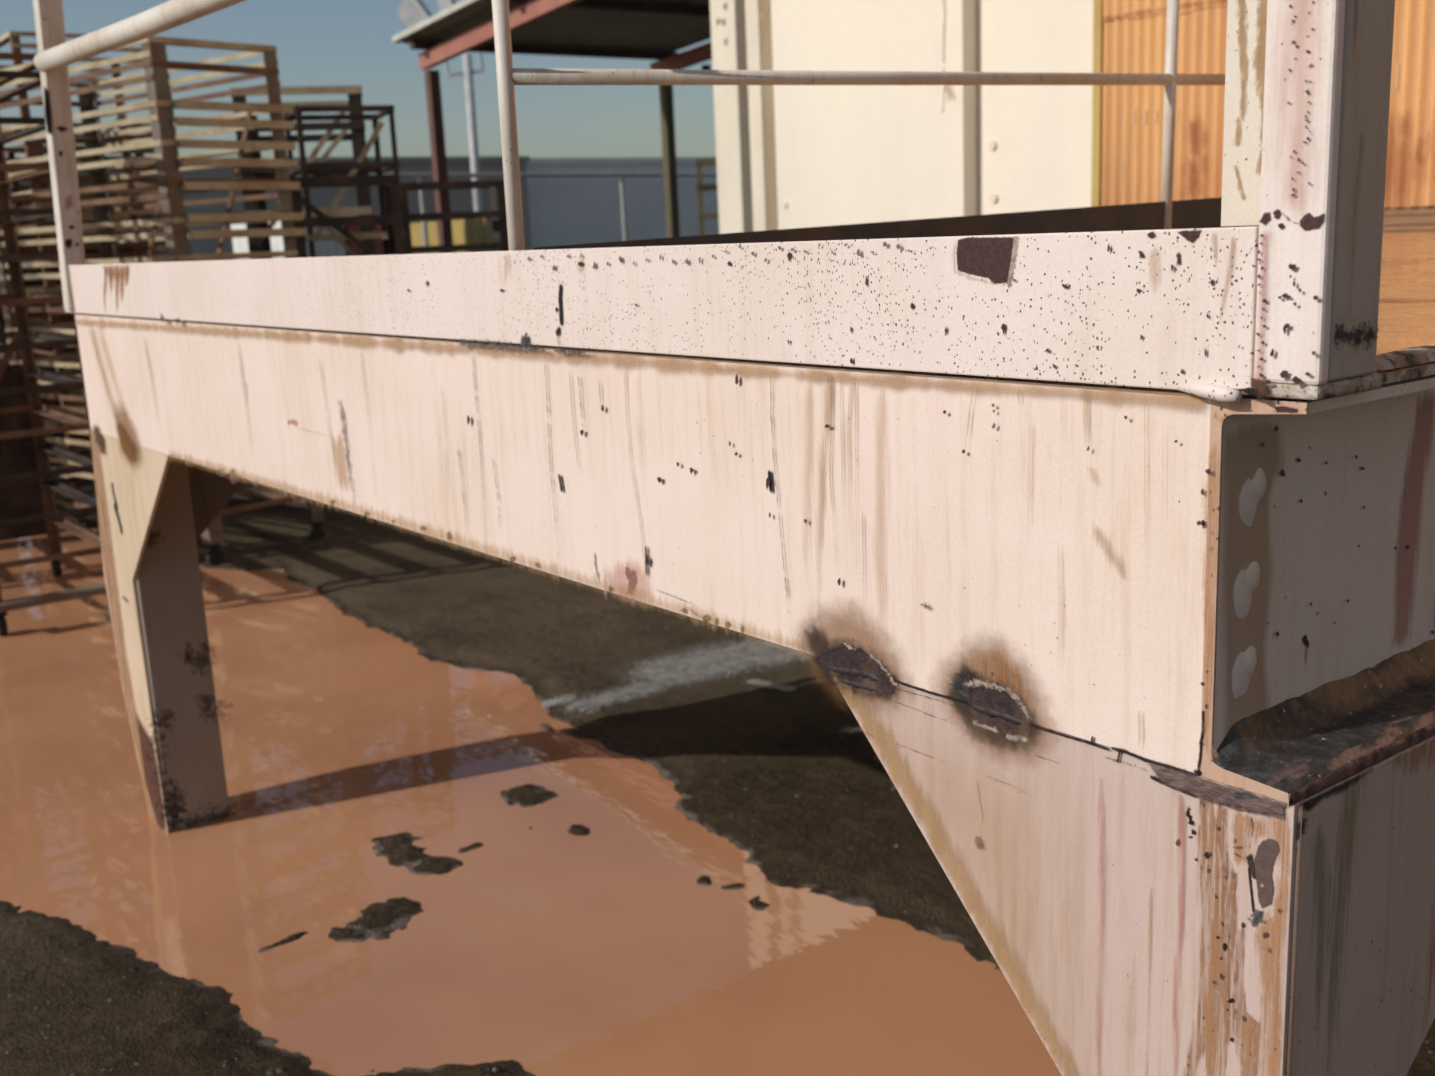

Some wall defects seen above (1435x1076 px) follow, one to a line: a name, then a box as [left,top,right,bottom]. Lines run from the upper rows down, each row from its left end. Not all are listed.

corrosion [1236,0,1267,171]
corrosion [103,265,129,308]
corrosion [1397,399,1433,641]
corrosion [1149,764,1289,1076]